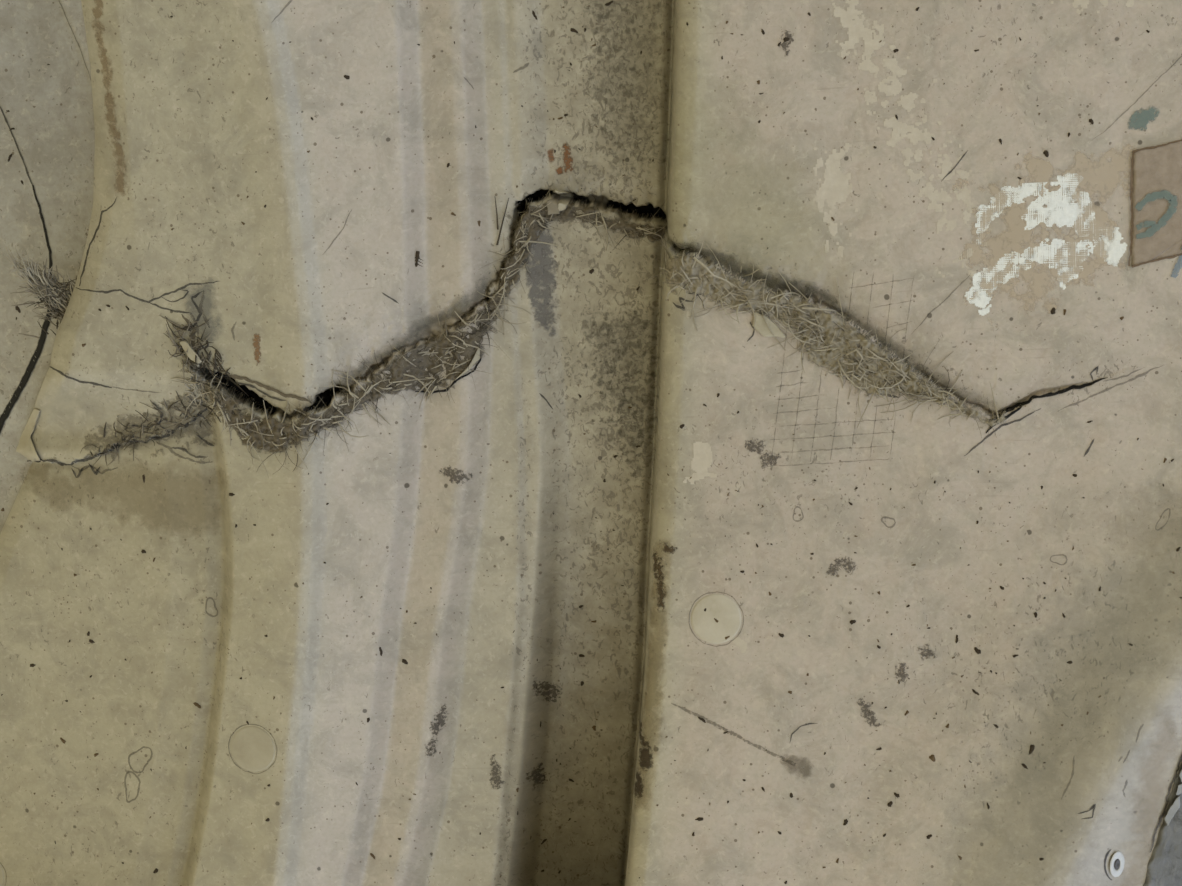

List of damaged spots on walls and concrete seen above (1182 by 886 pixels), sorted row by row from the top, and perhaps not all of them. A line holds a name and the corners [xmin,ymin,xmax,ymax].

crack [0,107,1108,479]
peeling [809,143,858,257]
peeling [831,0,1136,316]
peeling [1164,770,1182,825]